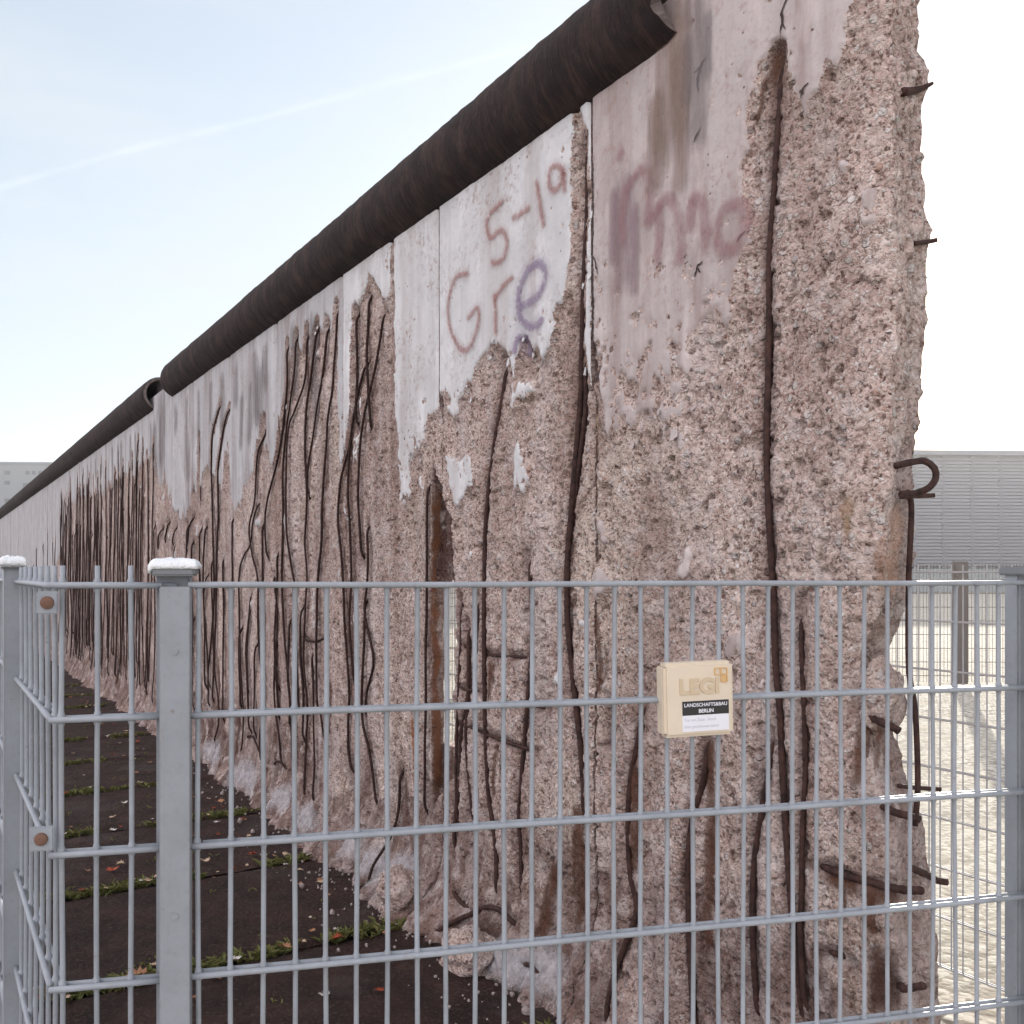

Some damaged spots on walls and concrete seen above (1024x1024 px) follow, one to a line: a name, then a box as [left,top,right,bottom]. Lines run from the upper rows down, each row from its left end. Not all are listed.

corrosion [756,53,785,123]
spalling [33,0,942,834]
corrosion [430,492,442,788]
corrosion [853,727,883,783]
spalling [297,801,925,943]
spalling [485,912,927,1024]